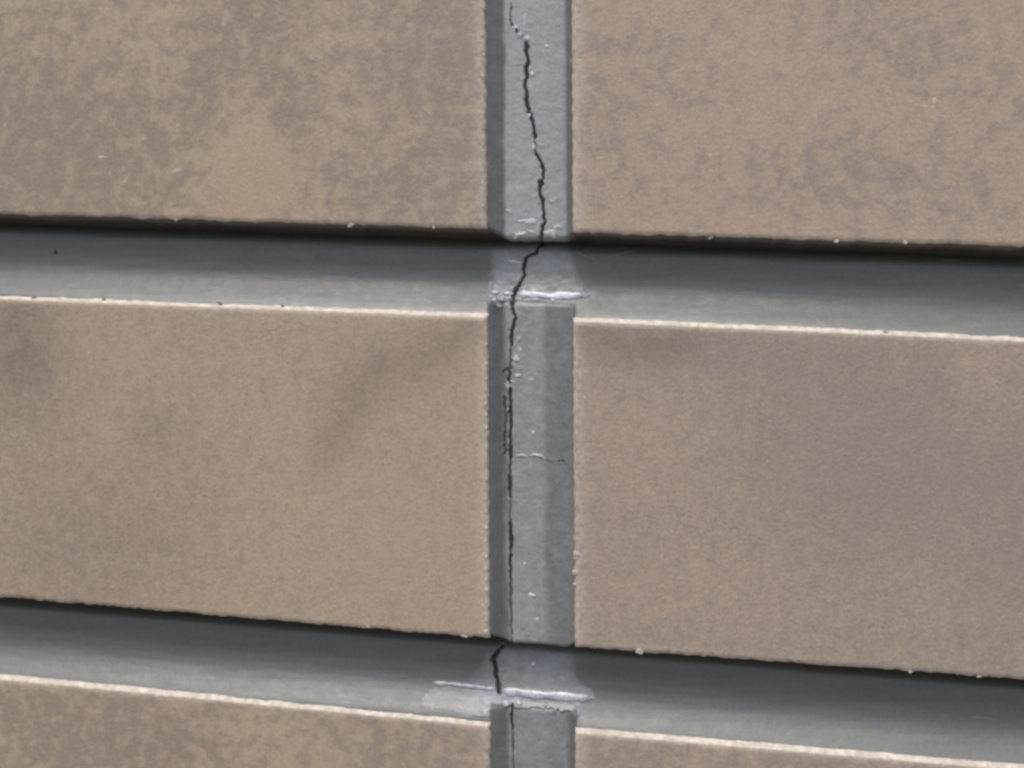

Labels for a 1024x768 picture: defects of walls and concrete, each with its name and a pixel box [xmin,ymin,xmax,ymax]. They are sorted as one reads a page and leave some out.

crack [490,4,563,768]